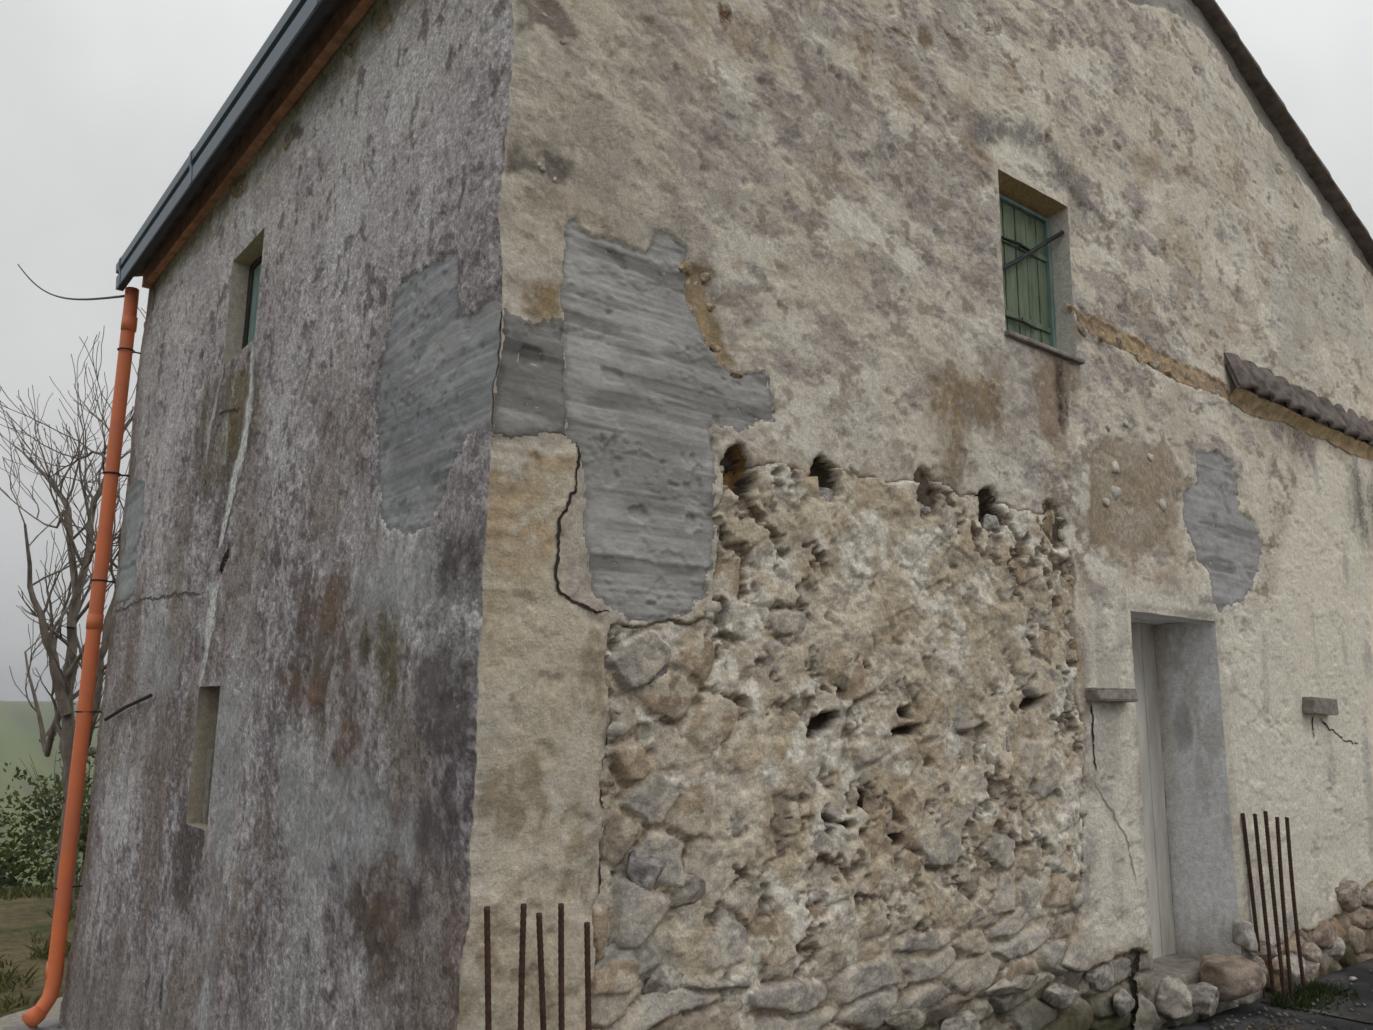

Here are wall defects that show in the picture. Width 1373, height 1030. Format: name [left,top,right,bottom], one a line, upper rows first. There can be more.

spalling [678,260,743,379]
crack [115,548,230,612]
crack [554,442,610,614]
spalling [584,457,1373,1030]
spalling [484,906,492,1030]
spalling [517,903,565,1030]